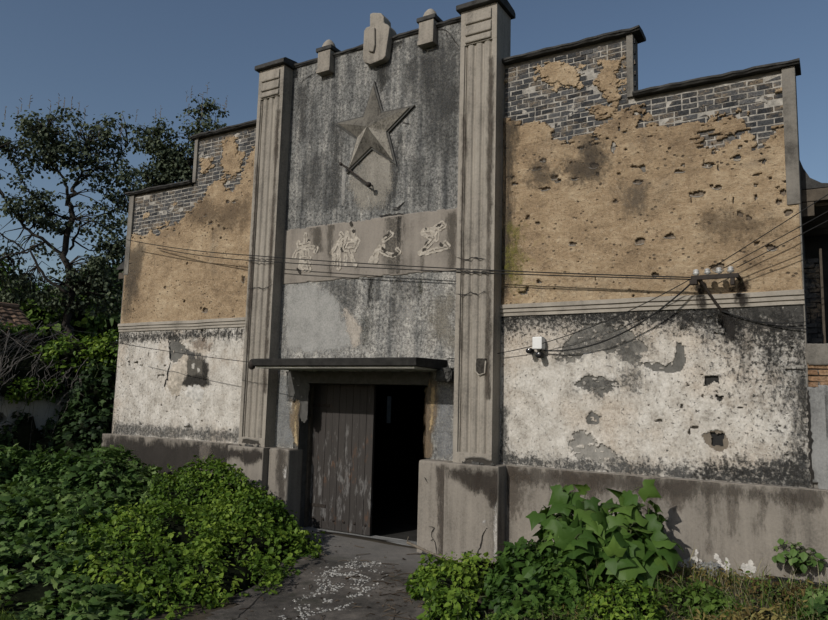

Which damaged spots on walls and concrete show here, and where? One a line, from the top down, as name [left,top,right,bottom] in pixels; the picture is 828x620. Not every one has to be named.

peeling [133,128,256,239]
leakage [404,38,467,157]
leakage [448,167,464,283]
leakage [501,120,524,293]
leakage [527,134,607,183]
peeling [504,39,784,171]
leakage [104,420,262,480]
peeling [568,410,617,465]
peeling [574,375,619,398]
peeling [555,321,686,375]
leakage [436,306,822,557]
spalling [702,429,728,452]